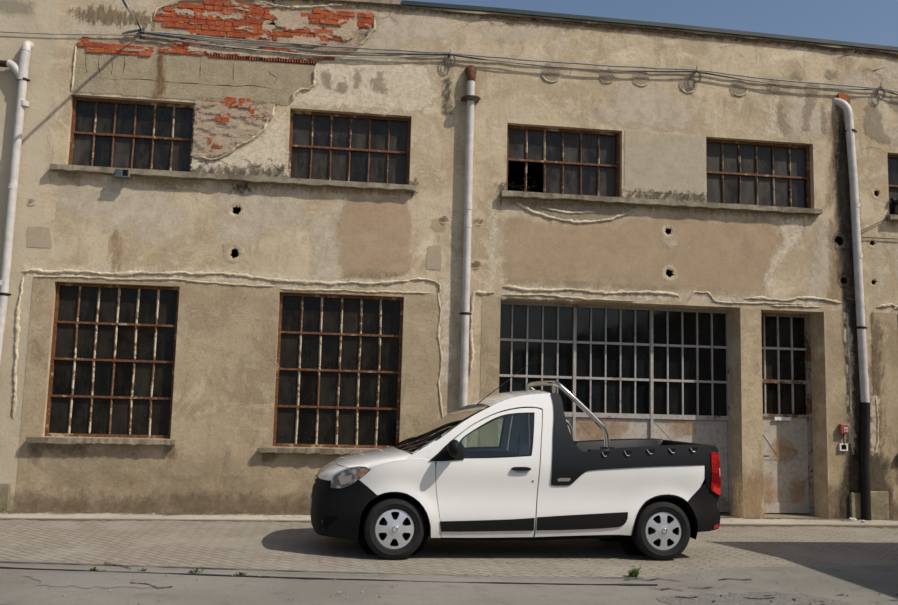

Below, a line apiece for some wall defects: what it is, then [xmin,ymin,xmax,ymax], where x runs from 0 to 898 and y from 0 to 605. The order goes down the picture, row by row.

spalling [63,0,898,177]
spalling [871,187,883,200]
damp [820,107,898,519]